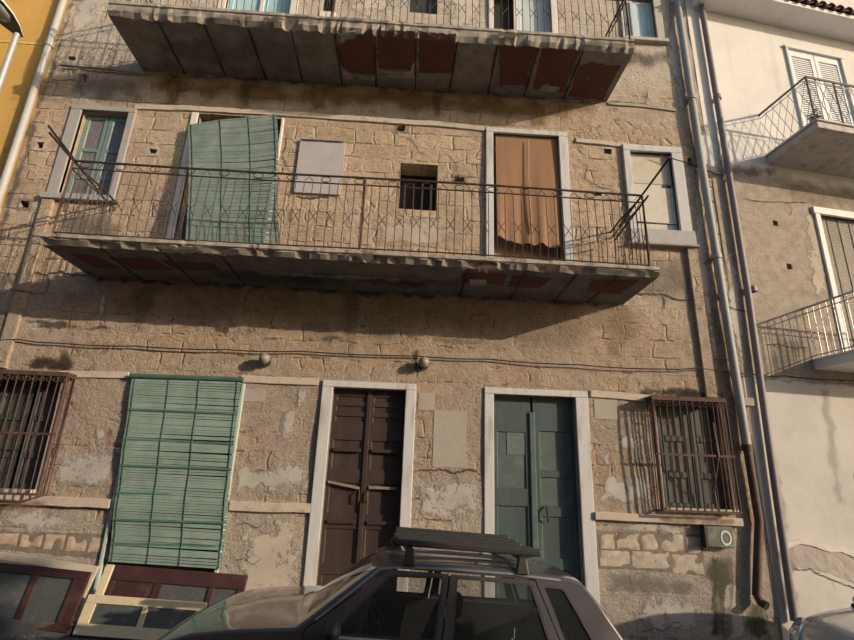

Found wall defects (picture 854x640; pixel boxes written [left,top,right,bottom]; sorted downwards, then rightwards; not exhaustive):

spalling [337,0,483,80]
spalling [497,31,620,100]
spalling [461,265,552,288]
flaking render [281,389,306,440]
flaking render [50,429,115,493]
flaking render [235,459,312,500]
crack [413,468,482,494]
flaking render [418,481,481,526]
spalling [0,508,113,560]
flaking render [236,519,300,591]
spalling [788,539,854,583]